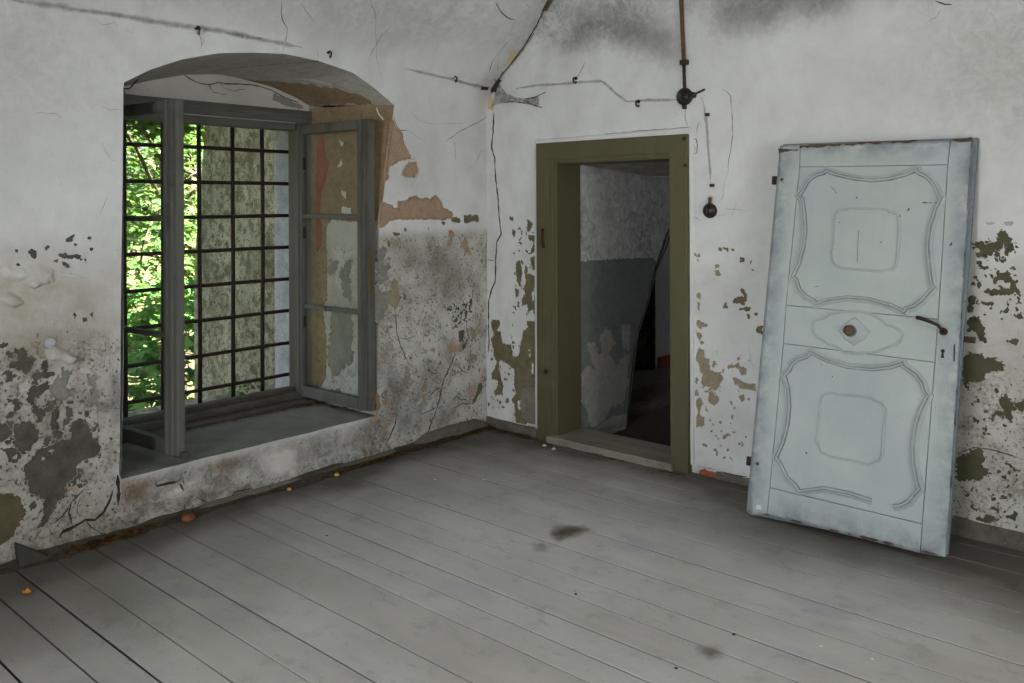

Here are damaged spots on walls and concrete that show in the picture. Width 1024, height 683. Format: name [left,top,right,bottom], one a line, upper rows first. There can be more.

crack [184,1,319,103]
peeling [0,337,104,546]
peeling [15,234,93,268]
crack [32,474,123,543]
spalling [244,78,535,425]
crack [369,0,503,444]
peeling [694,293,757,460]
peeling [723,288,763,334]
peeling [955,222,1024,528]